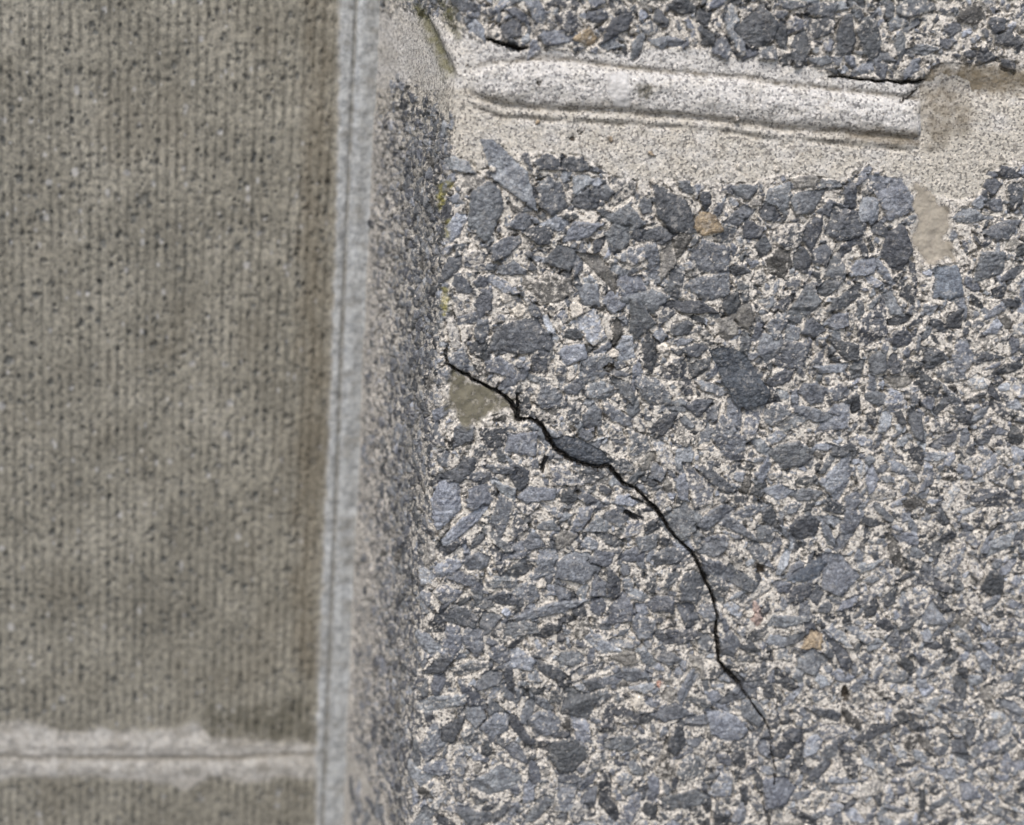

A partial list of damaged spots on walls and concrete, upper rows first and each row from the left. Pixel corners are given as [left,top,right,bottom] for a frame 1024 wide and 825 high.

crack [443,345,777,785]